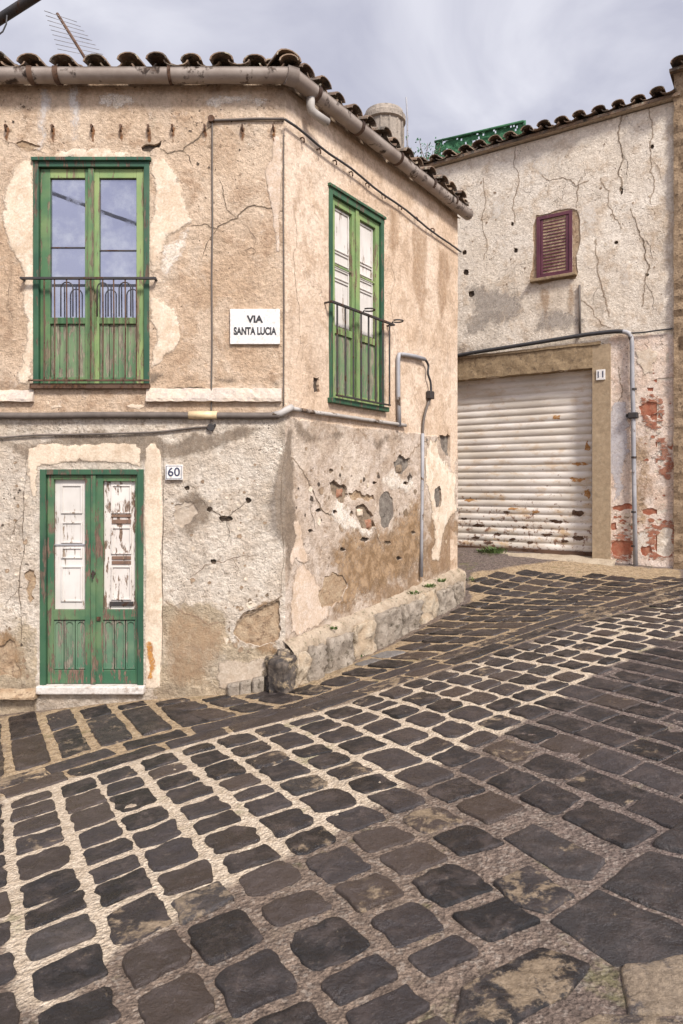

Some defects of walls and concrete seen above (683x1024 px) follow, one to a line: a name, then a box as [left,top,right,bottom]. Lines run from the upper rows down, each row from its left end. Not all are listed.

peeling [2,98,40,384]
peeling [52,144,192,272]
peeling [150,297,180,367]
crack [160,126,211,166]
crack [512,106,661,309]
crack [581,240,611,328]
spalling [171,477,281,654]
crack [162,440,345,653]
peeling [289,435,584,607]
corrosion [570,441,591,499]
flaking render [611,369,674,562]